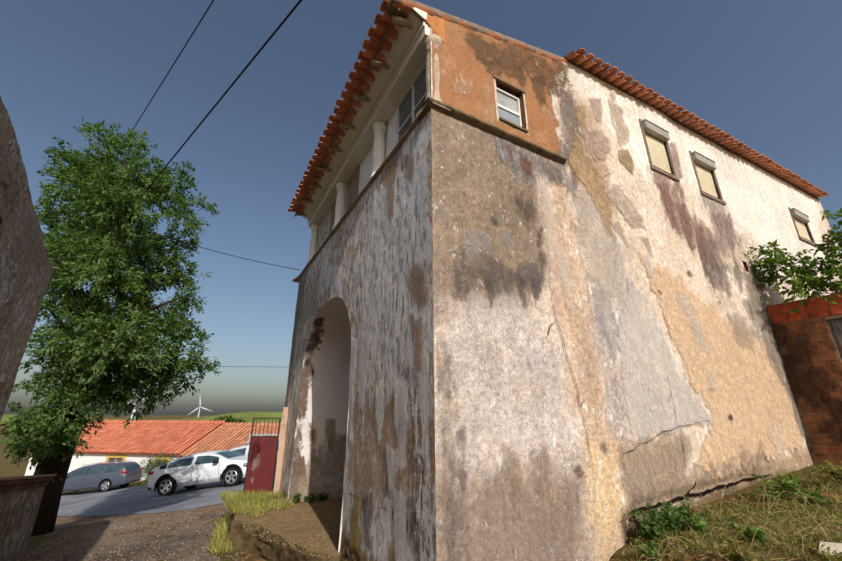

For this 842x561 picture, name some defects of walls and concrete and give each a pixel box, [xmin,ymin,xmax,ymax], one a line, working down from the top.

water stain [466,31,582,219]
peeling [342,129,433,561]
water stain [455,224,570,307]
water stain [647,142,842,457]
crack [618,380,770,513]